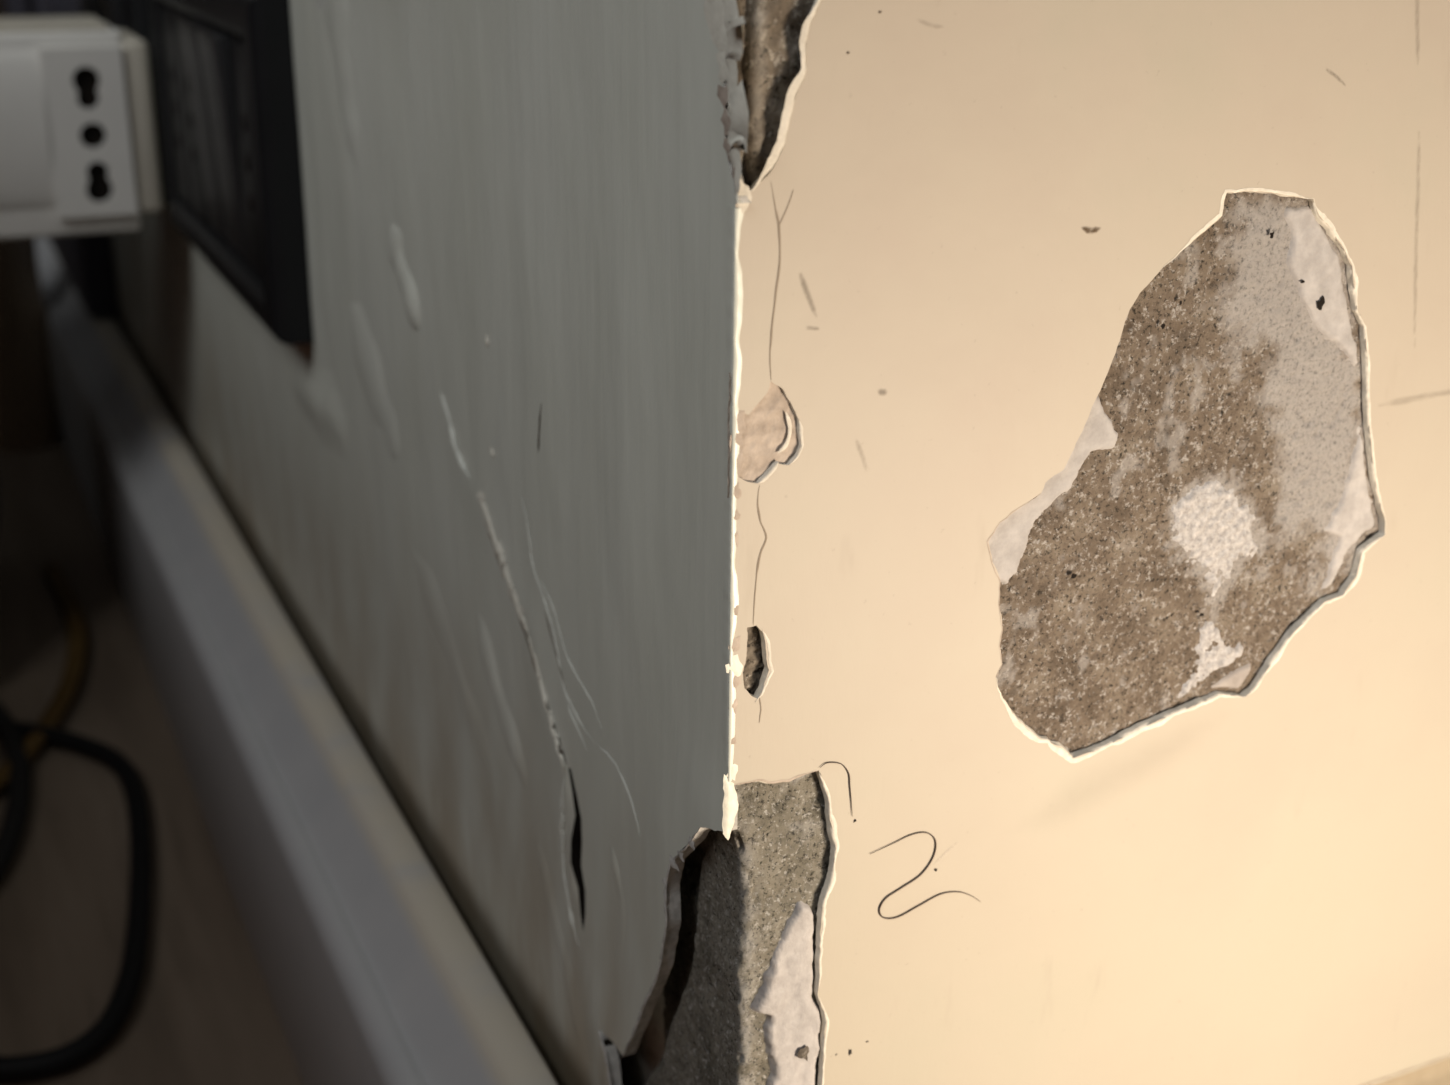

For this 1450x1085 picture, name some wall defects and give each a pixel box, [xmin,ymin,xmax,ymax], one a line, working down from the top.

crack [441,394,641,947]
spalling [598,0,839,1085]
flaking render [987,188,1386,763]